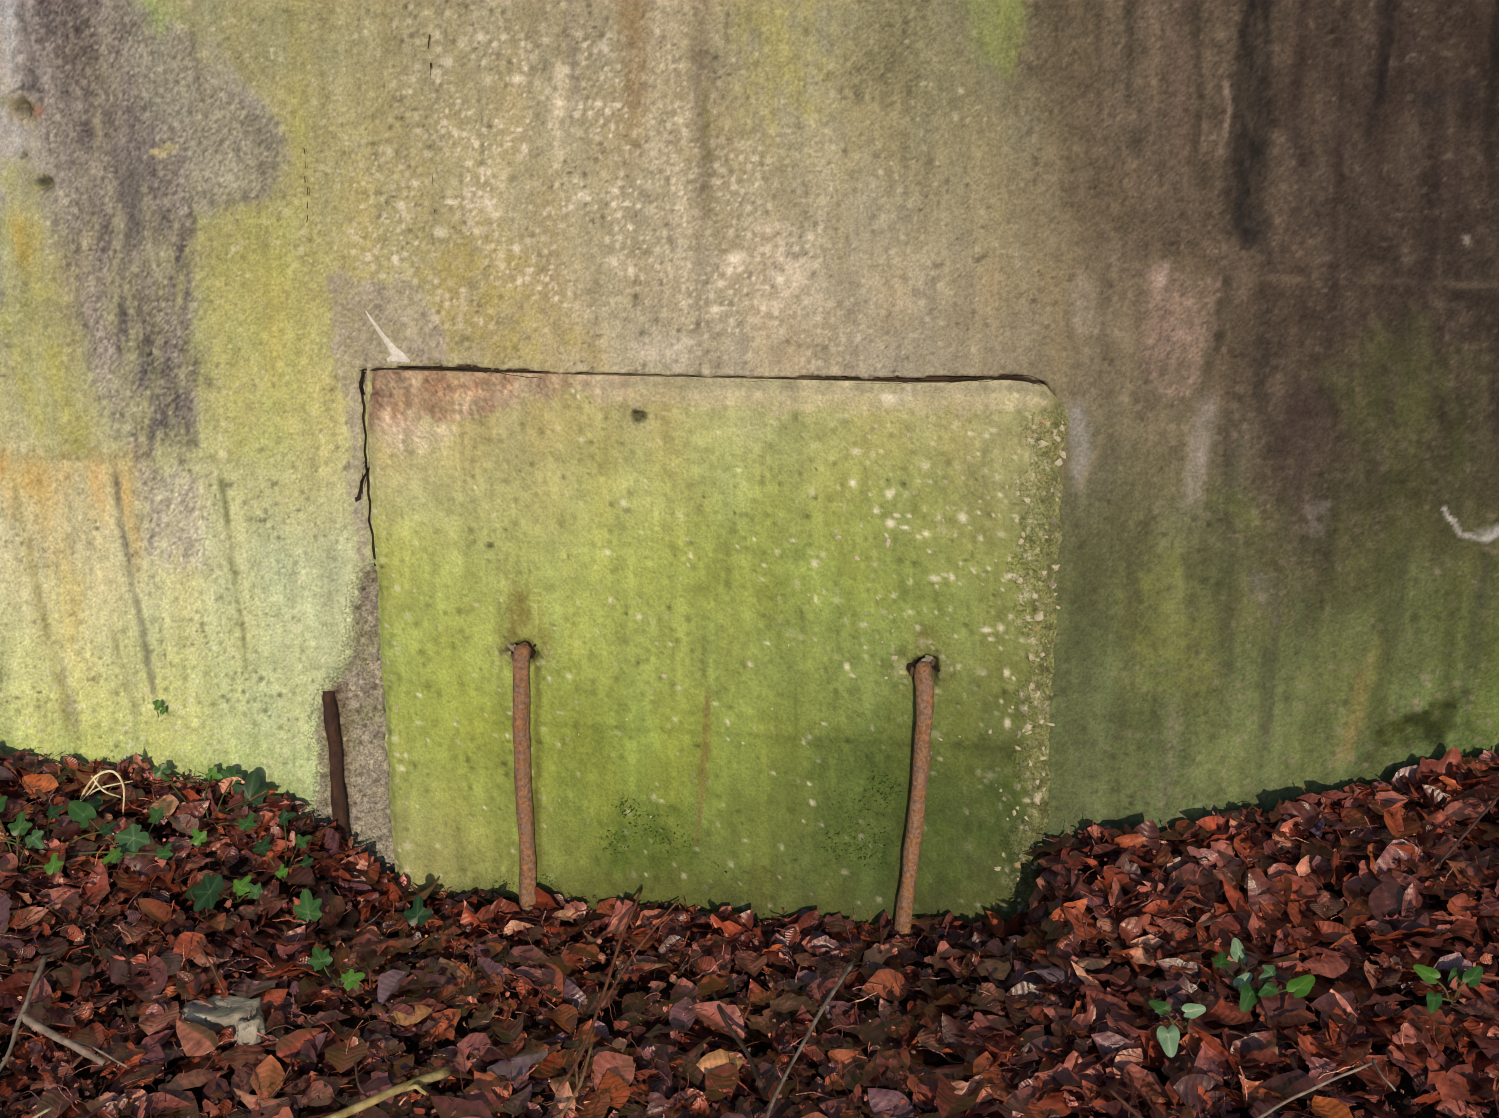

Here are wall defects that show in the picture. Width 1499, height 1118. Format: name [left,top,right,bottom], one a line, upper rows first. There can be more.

water stain [0,0,319,743]
rust [485,572,564,875]
water stain [409,773,1023,938]
water stain [589,0,1190,853]
rust [890,606,957,902]
water stain [998,0,1499,764]